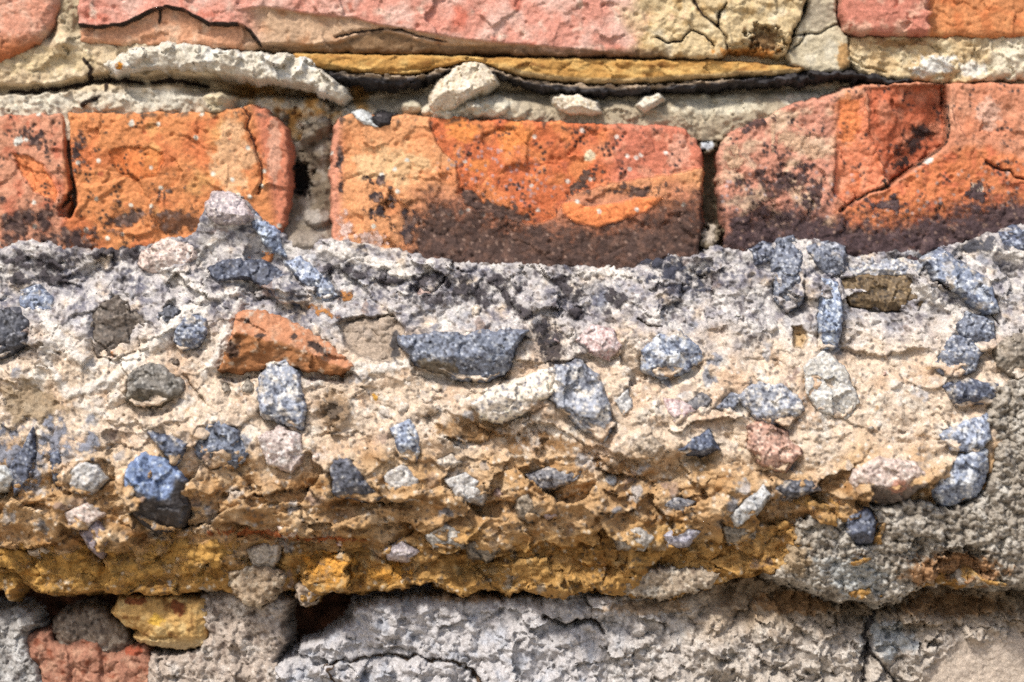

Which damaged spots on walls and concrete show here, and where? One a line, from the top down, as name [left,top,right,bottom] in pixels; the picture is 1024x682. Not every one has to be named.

crack [78,5,262,47]
crack [657,0,728,50]
crack [790,1,830,51]
crack [917,105,950,166]
crack [856,179,890,200]
spalling [337,314,405,362]
spalling [793,327,807,348]
crack [861,610,895,682]